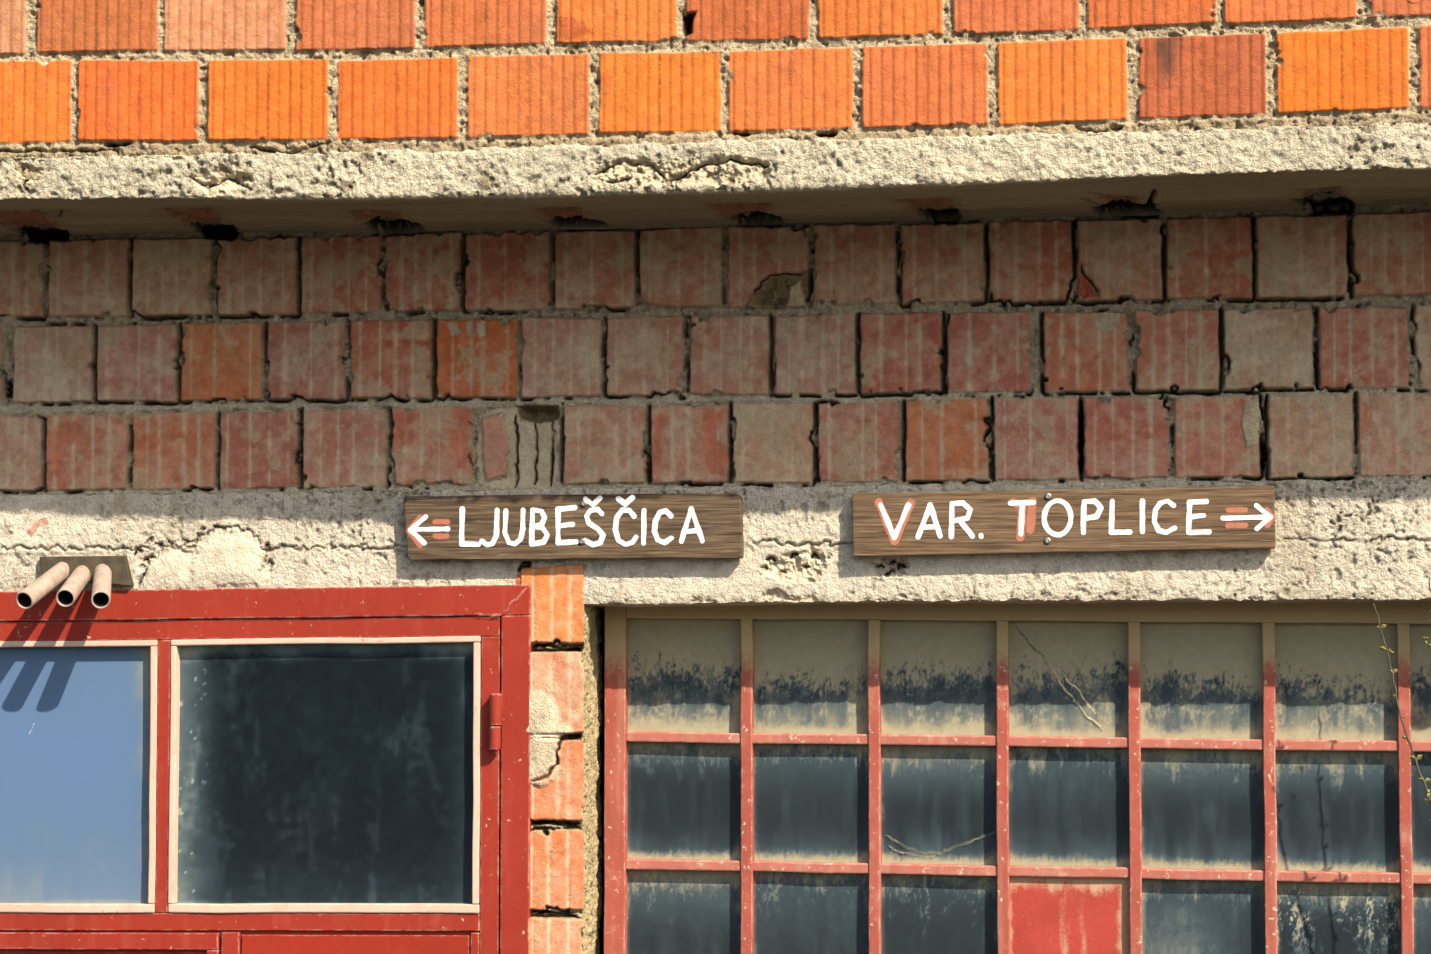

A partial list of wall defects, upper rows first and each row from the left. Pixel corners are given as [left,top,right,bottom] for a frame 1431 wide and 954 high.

peeling [526,686,582,789]